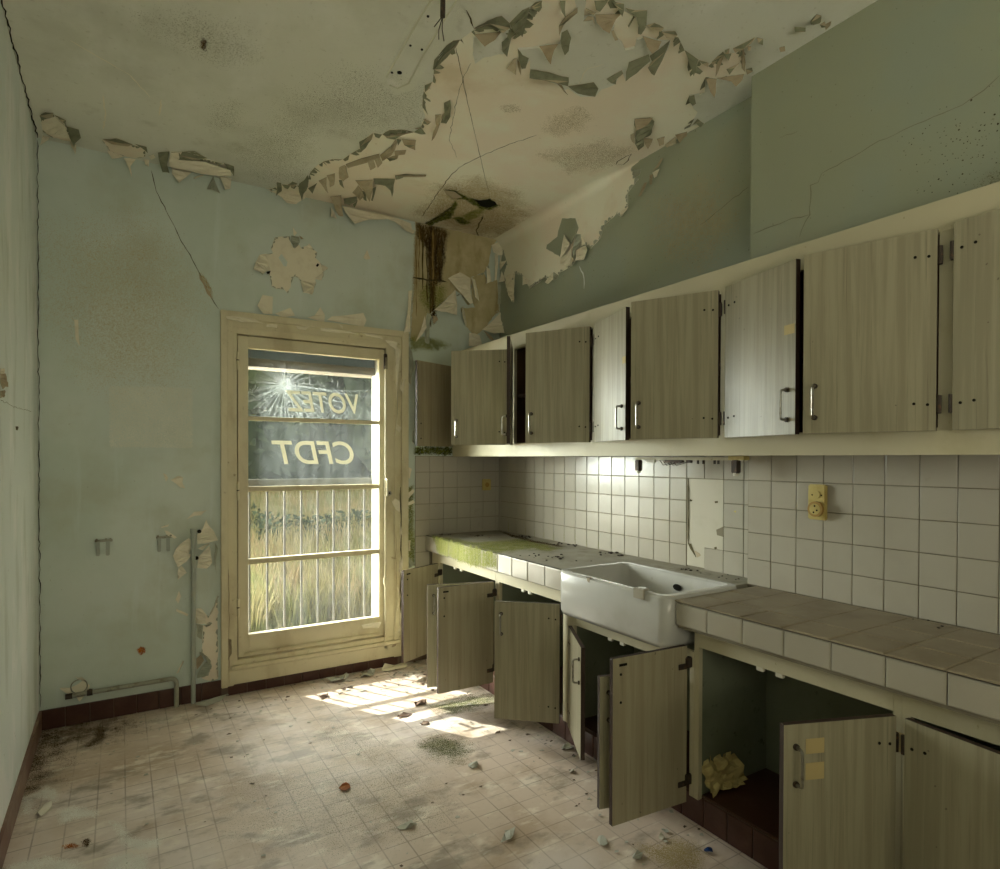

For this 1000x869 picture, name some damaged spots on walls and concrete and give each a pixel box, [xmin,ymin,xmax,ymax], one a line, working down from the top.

peeling [40,112,81,154]
peeling [102,138,234,193]
crack [423,50,533,215]
peeling [265,0,763,303]
crack [151,171,200,274]
peeling [226,228,328,328]
damp [401,174,538,353]
peeling [164,521,218,579]
peeling [687,479,724,568]
peeling [176,592,232,681]